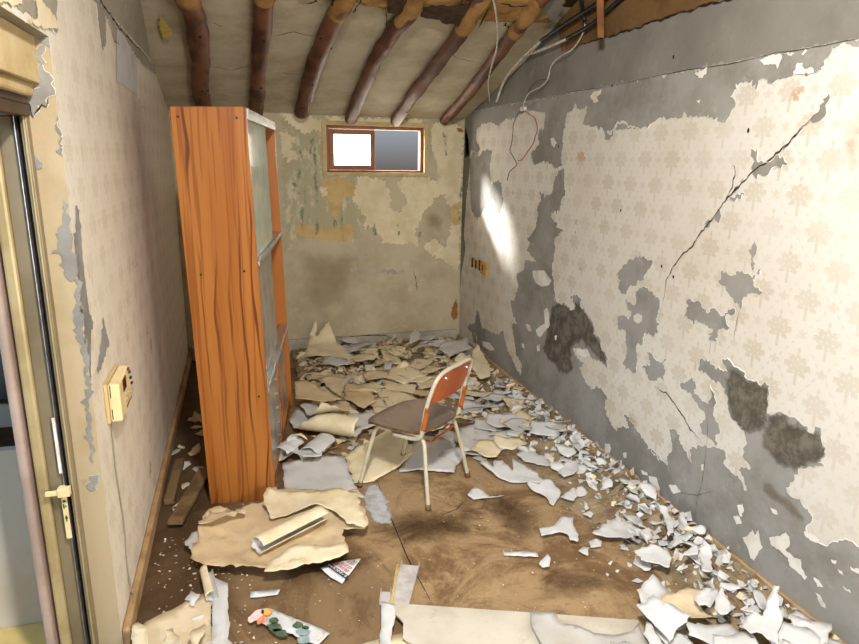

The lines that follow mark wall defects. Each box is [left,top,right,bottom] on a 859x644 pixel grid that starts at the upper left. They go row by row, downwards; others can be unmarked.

peeling [25,0,59,30]
peeling [760,49,814,75]
peeling [279,113,464,272]
crack [662,94,830,305]
peeling [533,270,551,287]
peeling [526,308,557,351]
water stain [544,304,605,373]
water stain [727,370,825,468]
peeling [641,470,681,494]
peeling [733,504,744,525]
peeling [743,530,826,608]